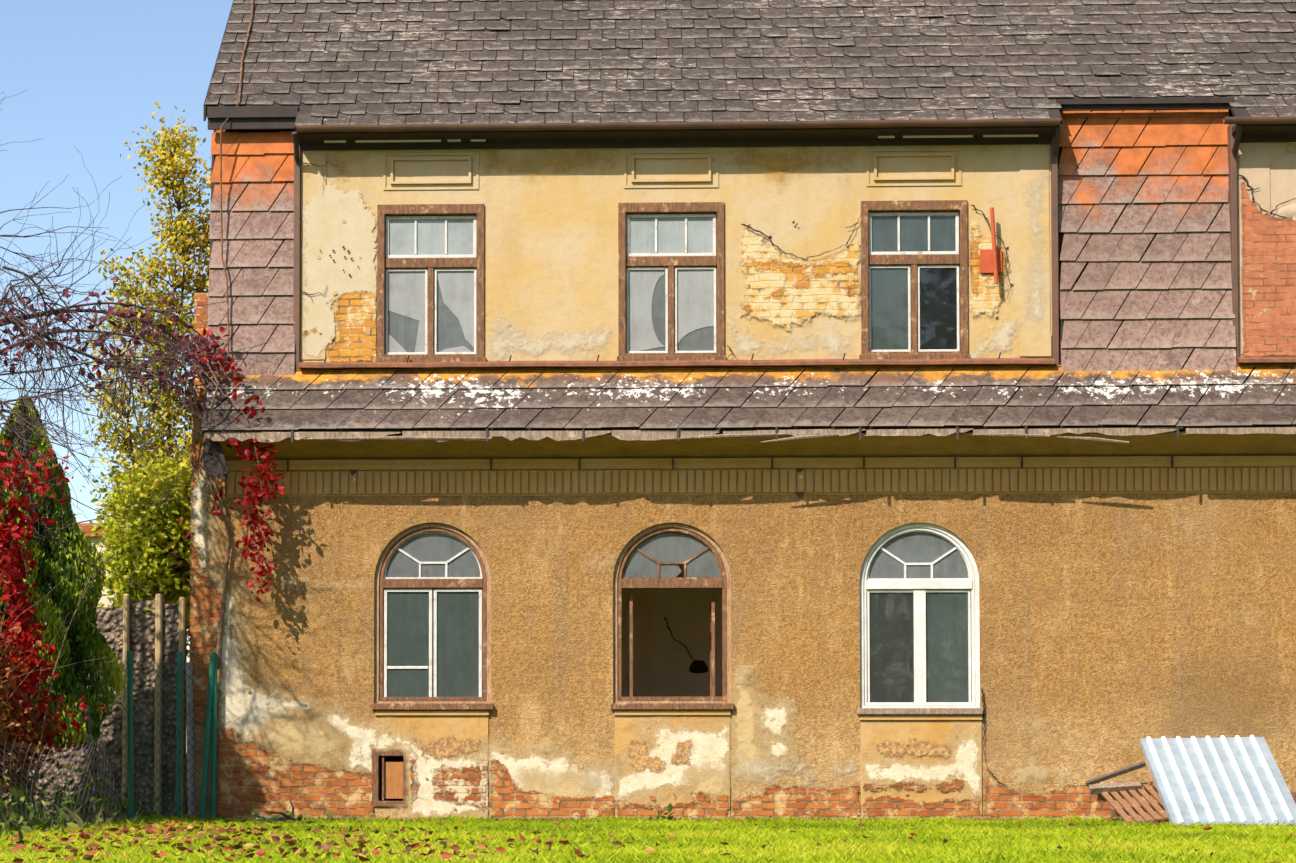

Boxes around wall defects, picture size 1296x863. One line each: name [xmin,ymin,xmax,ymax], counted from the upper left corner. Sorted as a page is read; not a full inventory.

peeling [301,183,377,362]
flaking render [738,221,860,331]
flaking render [969,222,1013,317]
flaking render [1241,182,1296,357]
flaking render [190,441,1166,818]